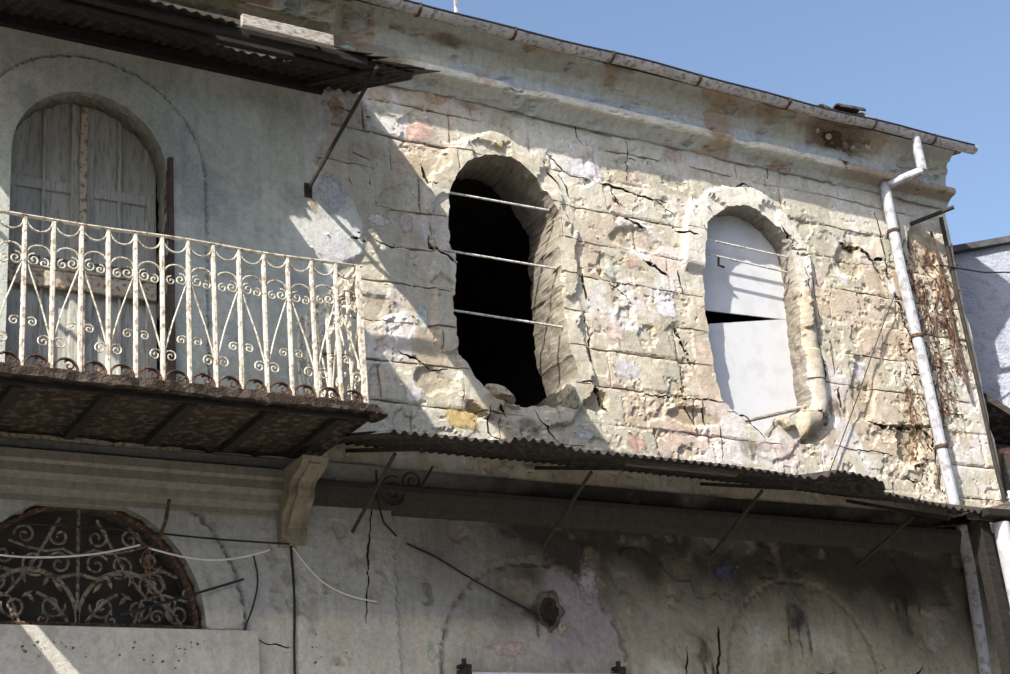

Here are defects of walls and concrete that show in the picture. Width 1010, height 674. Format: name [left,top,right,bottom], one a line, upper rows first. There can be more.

crack [421,166,438,184]
crack [547,141,698,235]
crack [427,236,458,263]
crack [581,275,608,411]
crack [645,259,683,295]
crack [782,226,843,410]
peeling [400,383,422,408]
peeling [445,408,477,429]
crack [644,328,765,457]
crack [364,511,372,618]